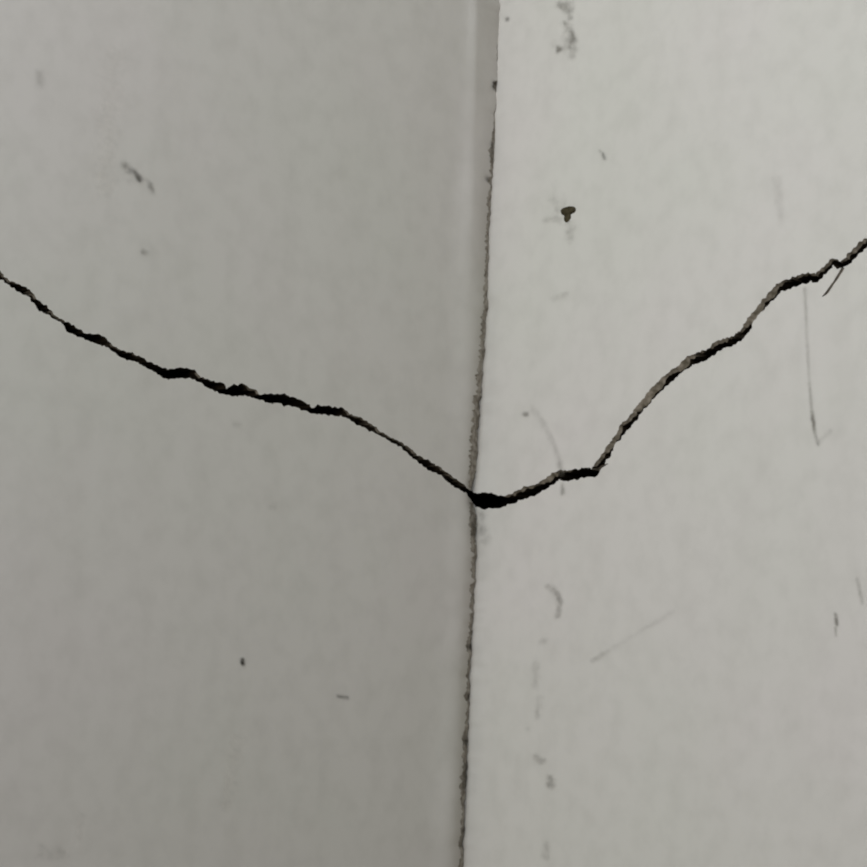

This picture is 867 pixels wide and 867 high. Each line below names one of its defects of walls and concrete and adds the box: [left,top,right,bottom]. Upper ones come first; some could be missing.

crack [0,238,867,867]
crack [468,108,496,488]